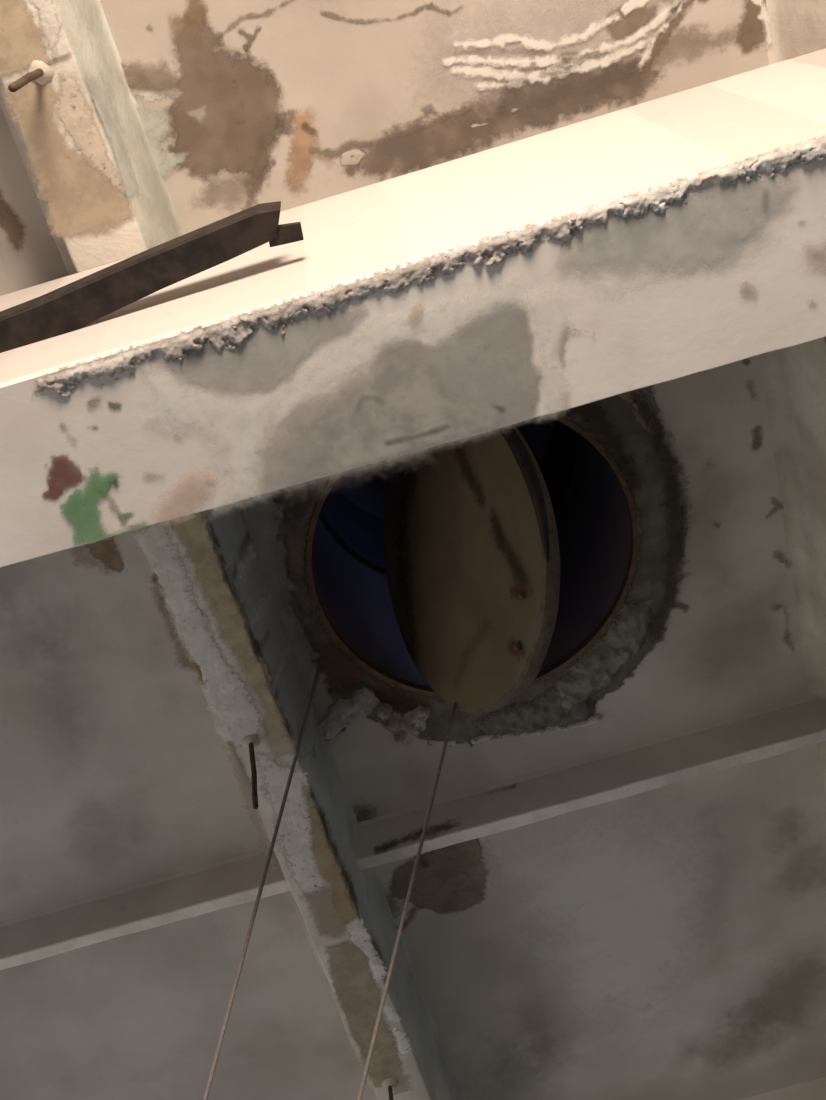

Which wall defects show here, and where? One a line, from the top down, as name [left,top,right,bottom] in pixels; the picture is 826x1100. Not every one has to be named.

peeling [0,0,138,237]
peeling [128,84,184,177]
spalling [33,136,826,409]
water stain [570,402,638,489]
peeling [638,385,659,417]
water stain [146,280,566,725]
water stain [73,536,124,572]
spalling [318,687,457,745]
peeling [132,511,412,1095]